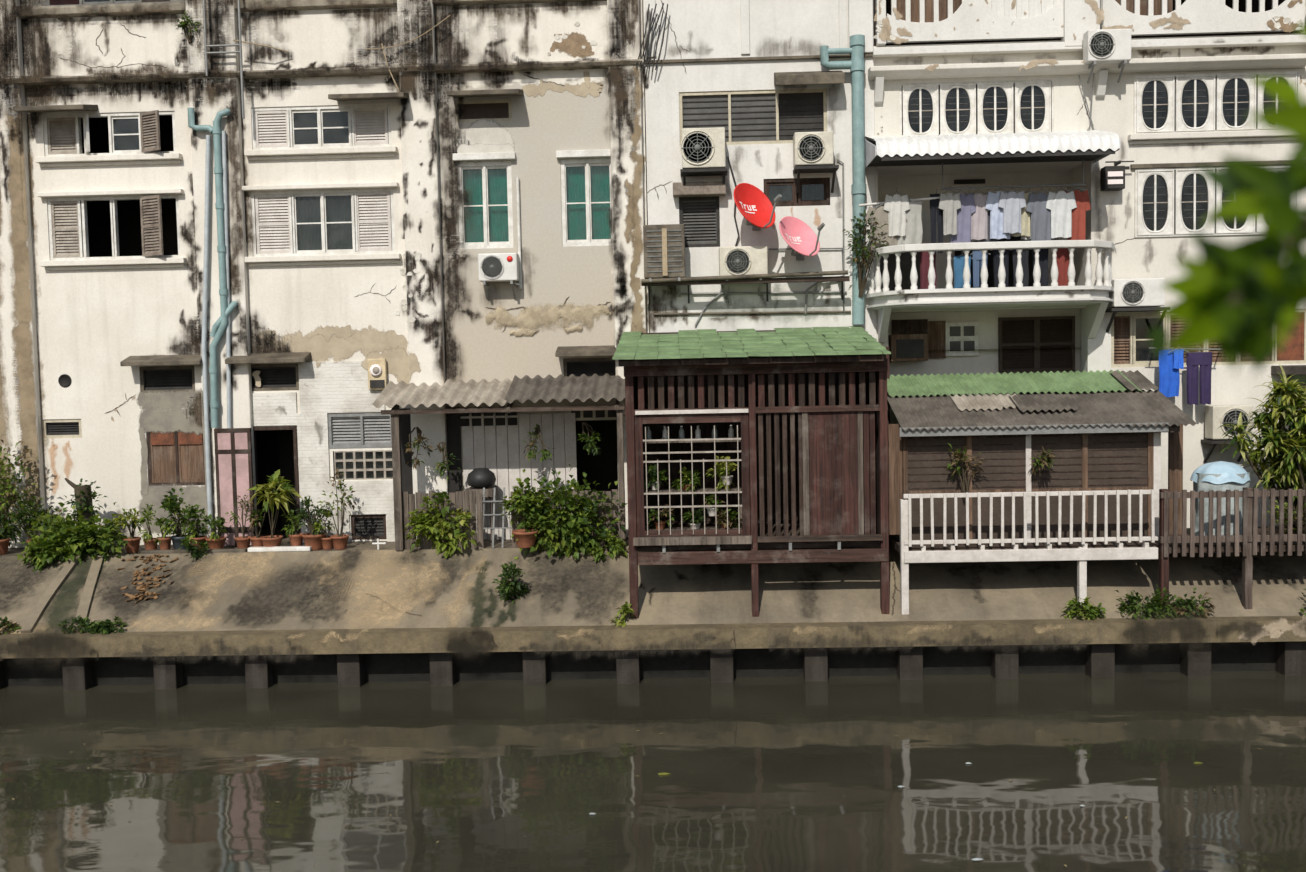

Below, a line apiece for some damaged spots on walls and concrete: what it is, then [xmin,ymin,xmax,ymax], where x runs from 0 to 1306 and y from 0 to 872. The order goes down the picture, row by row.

peeling [522,21,603,97]
peeling [1083,0,1134,31]
peeling [1150,12,1190,30]
leakage [87,0,656,389]
peeling [250,251,442,384]
leakage [670,285,687,323]